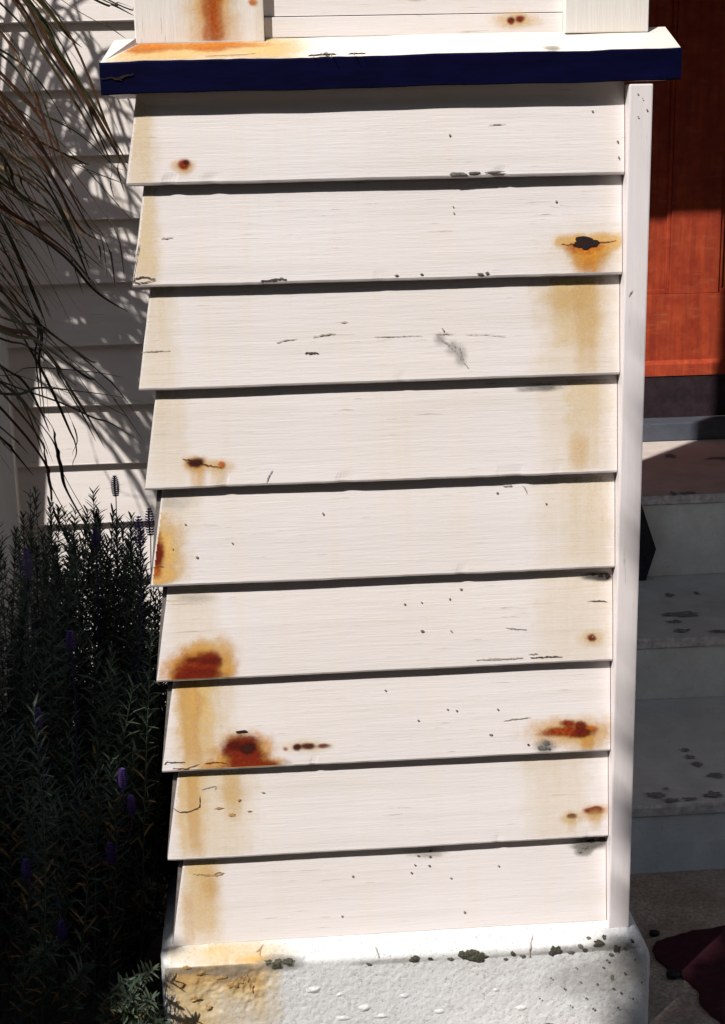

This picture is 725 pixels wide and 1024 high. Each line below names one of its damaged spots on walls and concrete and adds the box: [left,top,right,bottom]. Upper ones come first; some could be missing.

corrosion [115,0,296,61]
corrosion [177,160,190,171]
corrosion [556,233,621,272]
corrosion [183,458,224,478]
corrosion [153,517,182,585]
corrosion [166,641,235,680]
corrosion [205,734,328,769]
corrosion [538,720,606,748]
corrosion [566,806,603,820]